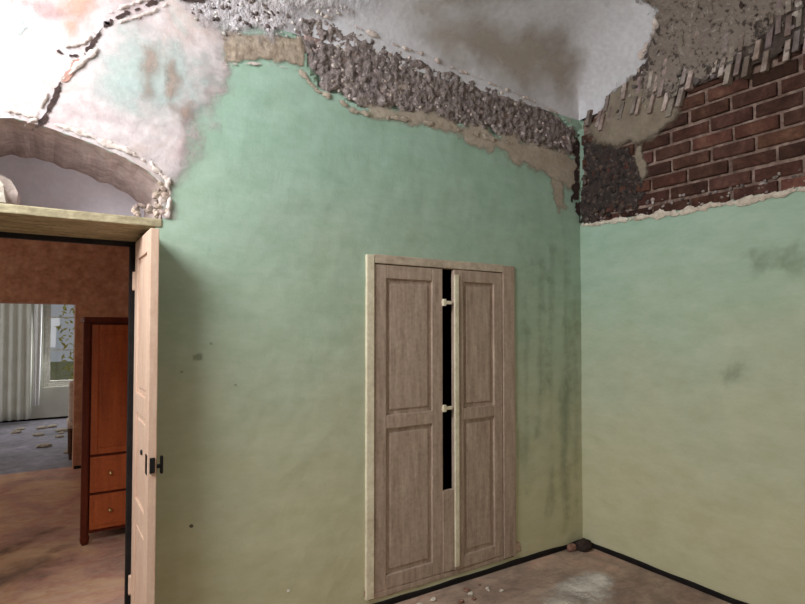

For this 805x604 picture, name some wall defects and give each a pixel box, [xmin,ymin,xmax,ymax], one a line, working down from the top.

crack [27,0,202,131]
peeling [0,0,805,227]